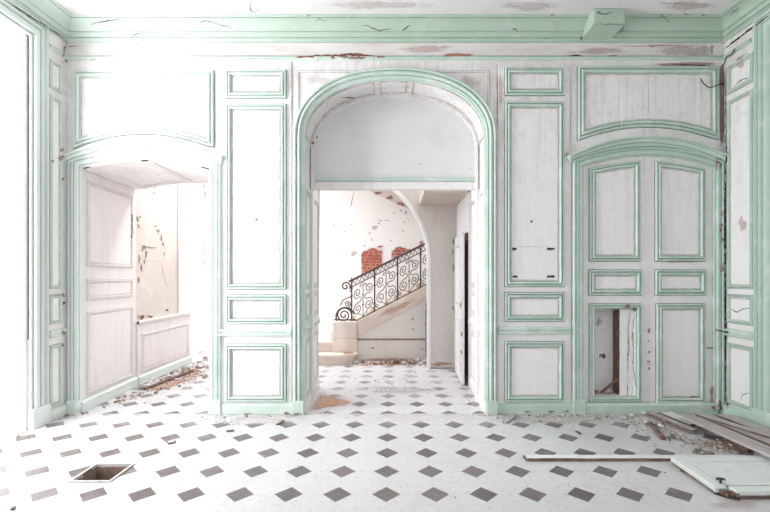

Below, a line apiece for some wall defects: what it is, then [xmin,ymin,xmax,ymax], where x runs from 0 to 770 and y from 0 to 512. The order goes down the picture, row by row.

peeling [138,225,165,283]
flaking render [351,192,424,276]